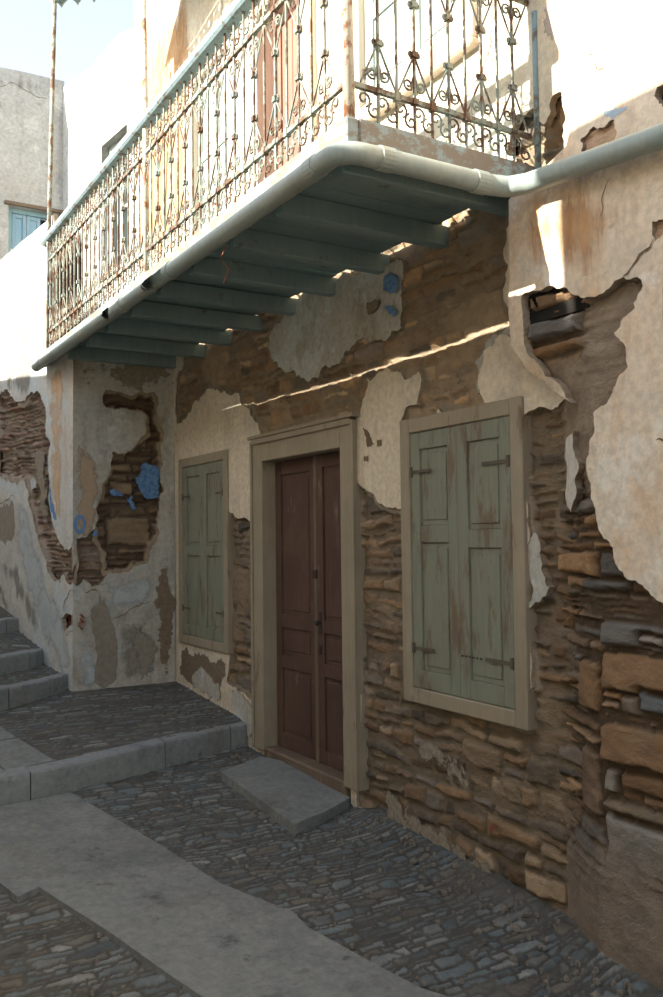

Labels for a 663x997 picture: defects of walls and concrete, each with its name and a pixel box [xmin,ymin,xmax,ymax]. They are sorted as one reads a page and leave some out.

rust [140,3,188,115]
spalling [654,85,663,107]
rust [141,87,188,264]
spalling [652,219,663,241]
flaking render [175,208,510,434]
flaking render [0,389,164,587]
spalling [62,613,85,631]
damp [91,601,118,688]
damp [132,568,176,678]
flaking render [179,516,252,737]
flaking render [356,277,663,991]